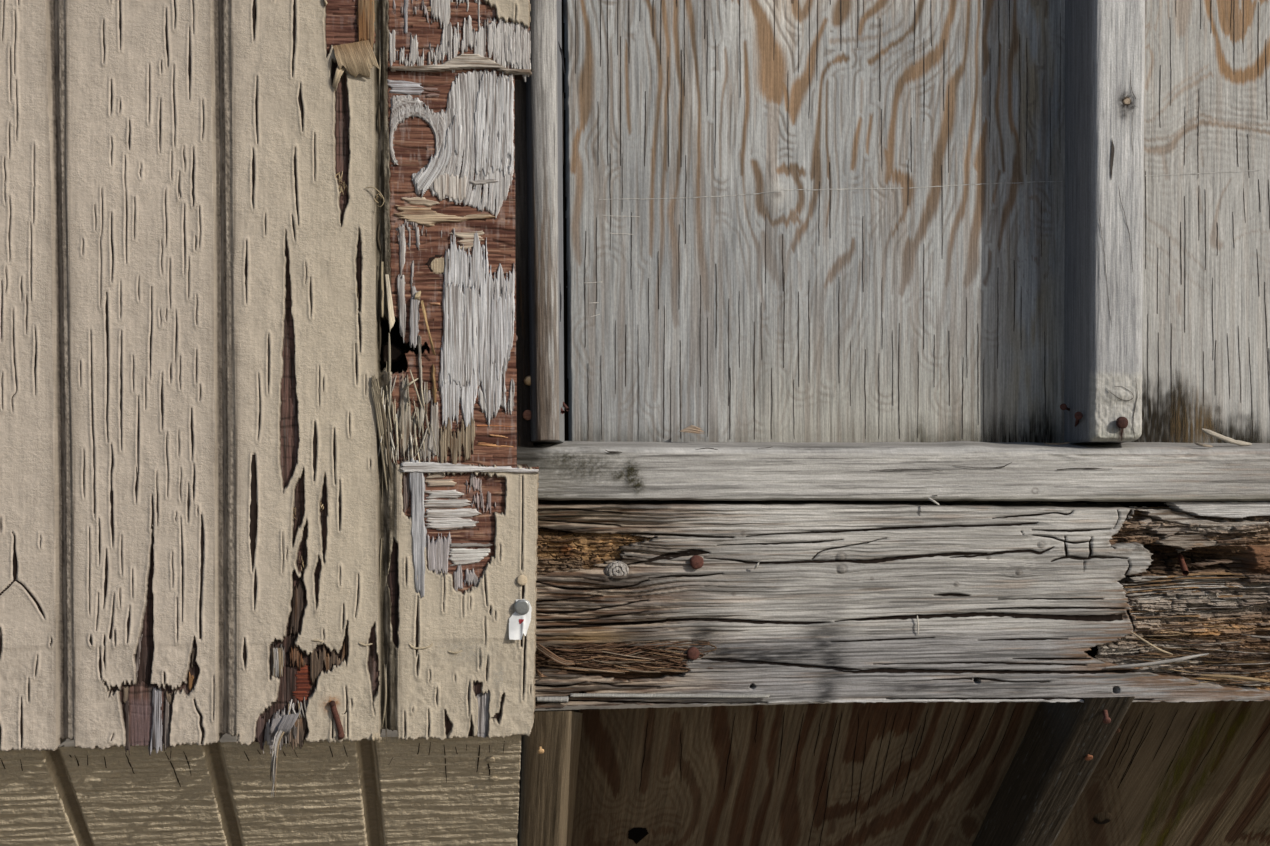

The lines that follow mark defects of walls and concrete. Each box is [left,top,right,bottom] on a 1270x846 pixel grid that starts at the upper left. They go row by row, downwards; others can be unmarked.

crack [0,0,37,410]
peeling [324,0,540,598]
crack [245,0,1234,846]
crack [1099,0,1270,441]
leakage [1132,379,1270,443]
crack [0,519,52,771]
crack [69,733,135,774]
spalling [110,634,199,756]
crack [165,675,298,787]
crack [241,638,249,667]
spalling [255,571,372,797]